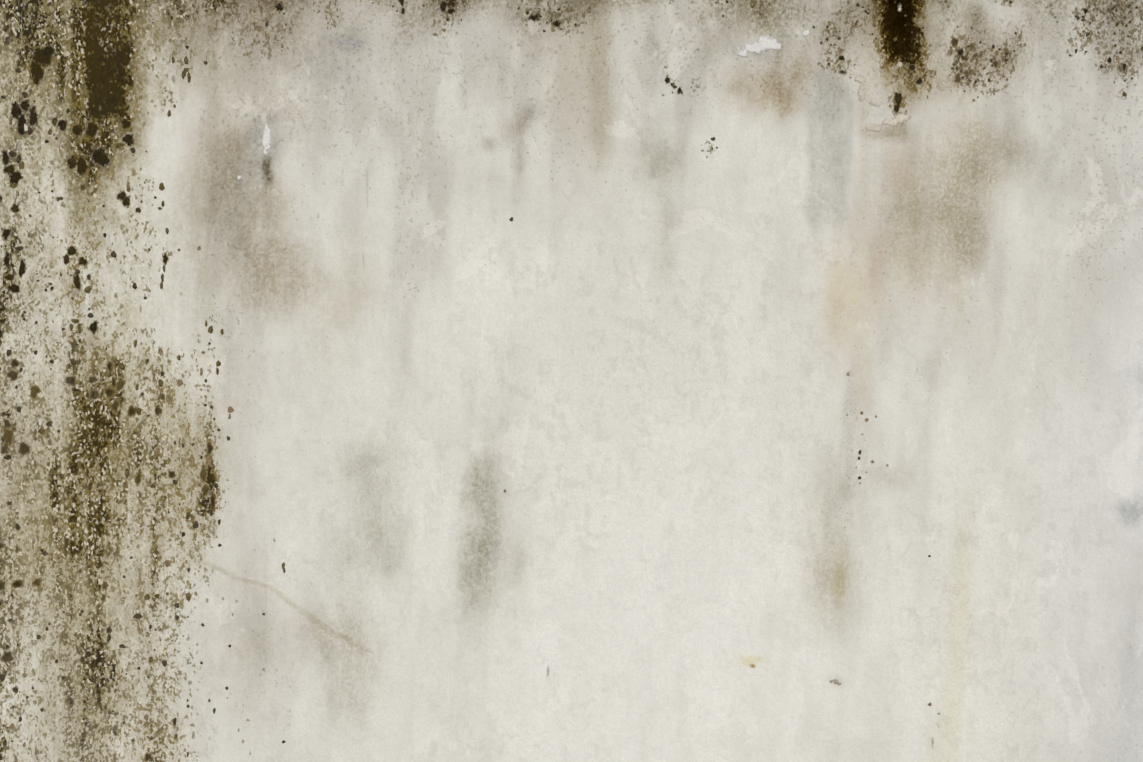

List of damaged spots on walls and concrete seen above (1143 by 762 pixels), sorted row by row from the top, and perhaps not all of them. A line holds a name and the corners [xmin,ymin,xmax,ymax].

leakage [313,0,343,34]
leakage [360,0,472,38]
leakage [516,0,591,37]
leakage [662,66,700,96]
leakage [813,0,921,78]
leakage [942,26,1026,101]
leakage [1066,0,1143,100]
leakage [892,92,903,115]
leakage [0,0,291,762]